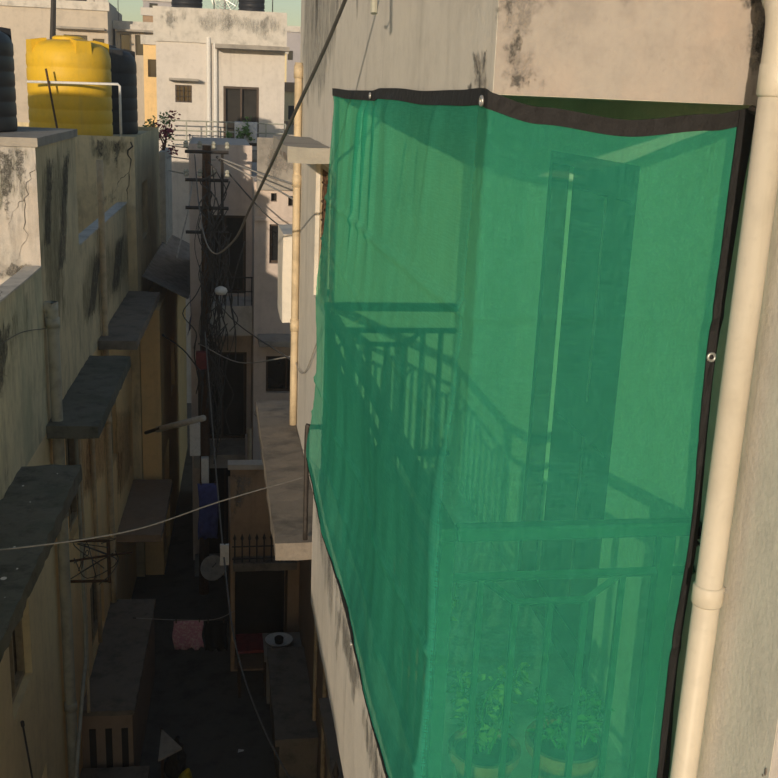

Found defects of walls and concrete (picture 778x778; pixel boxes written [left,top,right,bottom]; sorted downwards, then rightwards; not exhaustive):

leakage [747,0,765,70]
leakage [0,151,26,219]
leakage [42,153,69,299]